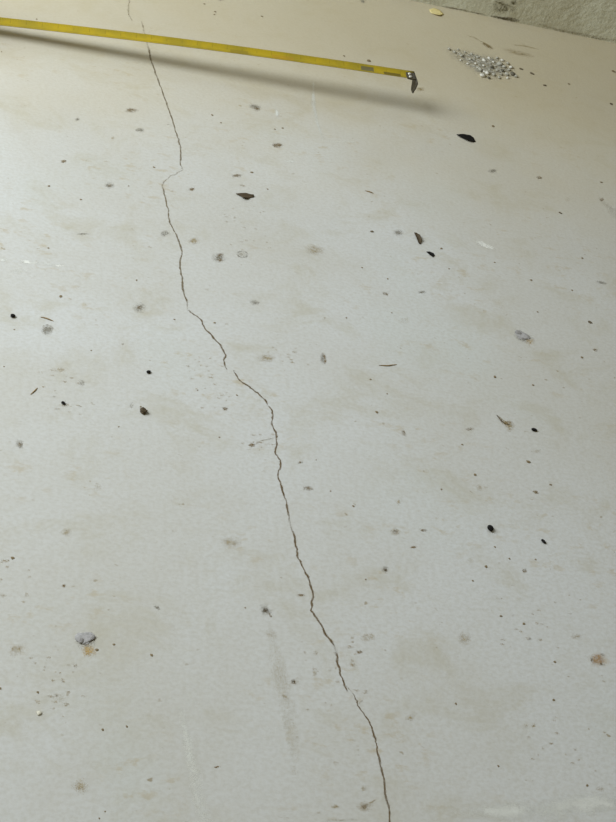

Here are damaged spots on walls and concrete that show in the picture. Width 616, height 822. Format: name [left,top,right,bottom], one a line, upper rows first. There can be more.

crack [127,0,391,822]